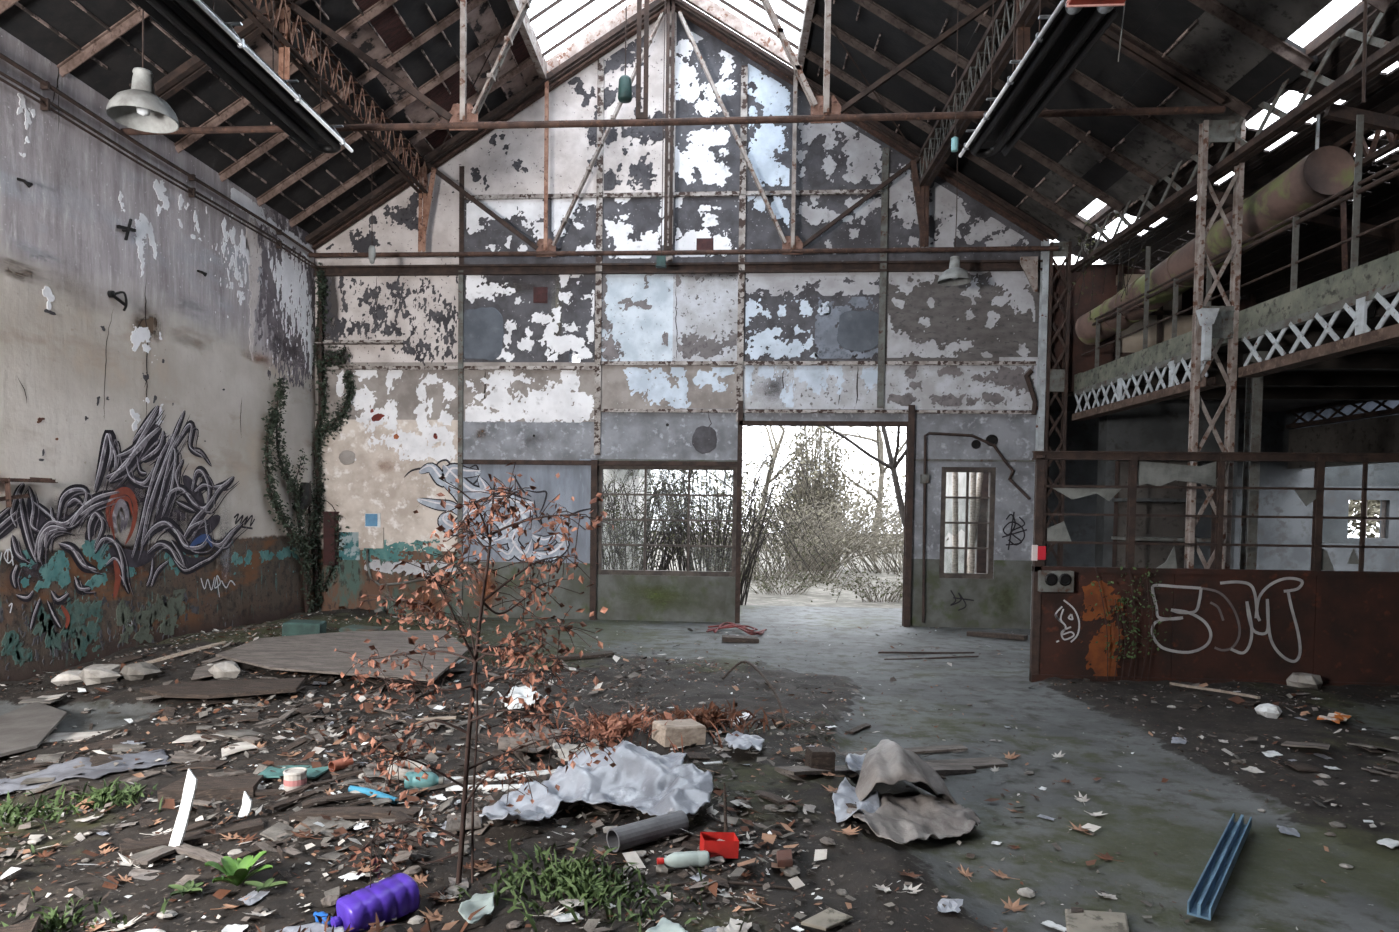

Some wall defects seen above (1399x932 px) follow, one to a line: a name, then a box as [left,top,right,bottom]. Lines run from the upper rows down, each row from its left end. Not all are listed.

peeling [118,32,1035,461]
rust [1080,580,1128,677]